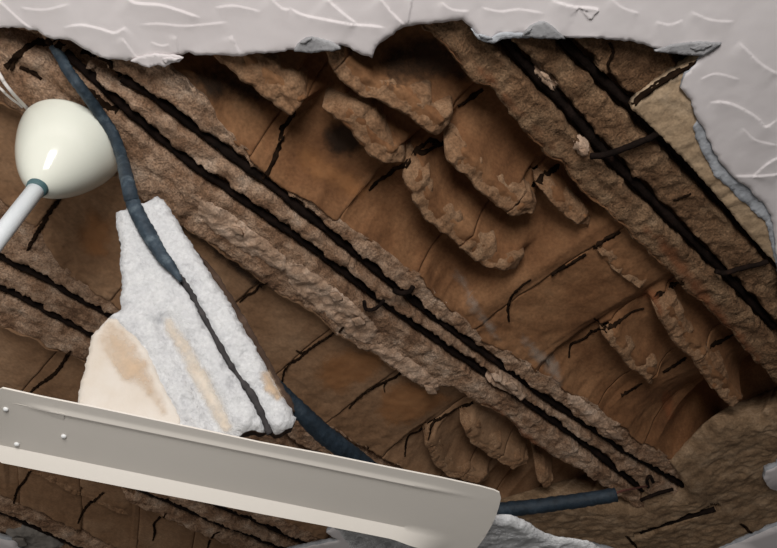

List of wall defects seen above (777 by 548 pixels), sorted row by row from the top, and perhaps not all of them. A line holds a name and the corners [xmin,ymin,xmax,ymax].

flaking render [131,53,184,68]
flaking render [294,36,341,53]
flaking render [471,21,565,43]
flaking render [653,41,722,56]
crack [262,111,296,180]
water stain [325,125,361,153]
crack [551,231,621,277]
spalling [198,197,440,394]
crack [568,281,684,358]
crack [29,351,72,393]
water stain [110,335,147,382]
crack [281,327,344,382]